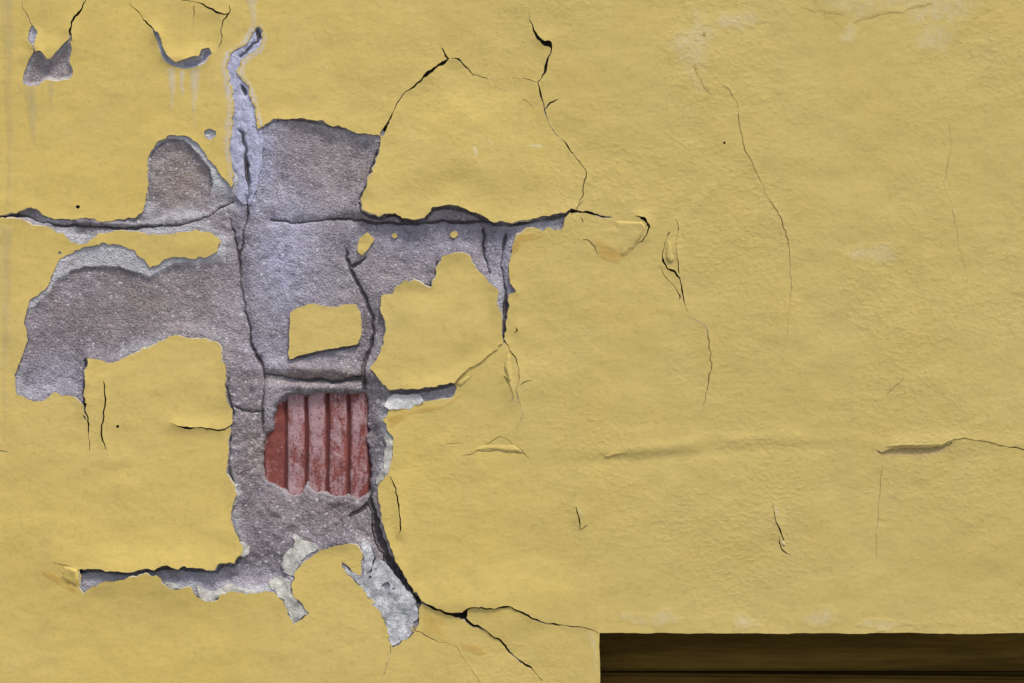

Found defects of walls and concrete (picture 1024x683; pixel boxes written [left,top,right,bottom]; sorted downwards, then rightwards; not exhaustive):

spalling [23,24,73,86]
spalling [152,27,212,69]
crack [518,21,558,114]
crack [2,0,530,432]
crack [564,141,607,254]
crack [637,216,687,310]
crack [695,69,790,258]
crack [83,381,107,451]
spalling [0,58,586,647]
crack [703,337,712,405]
crack [349,479,596,682]